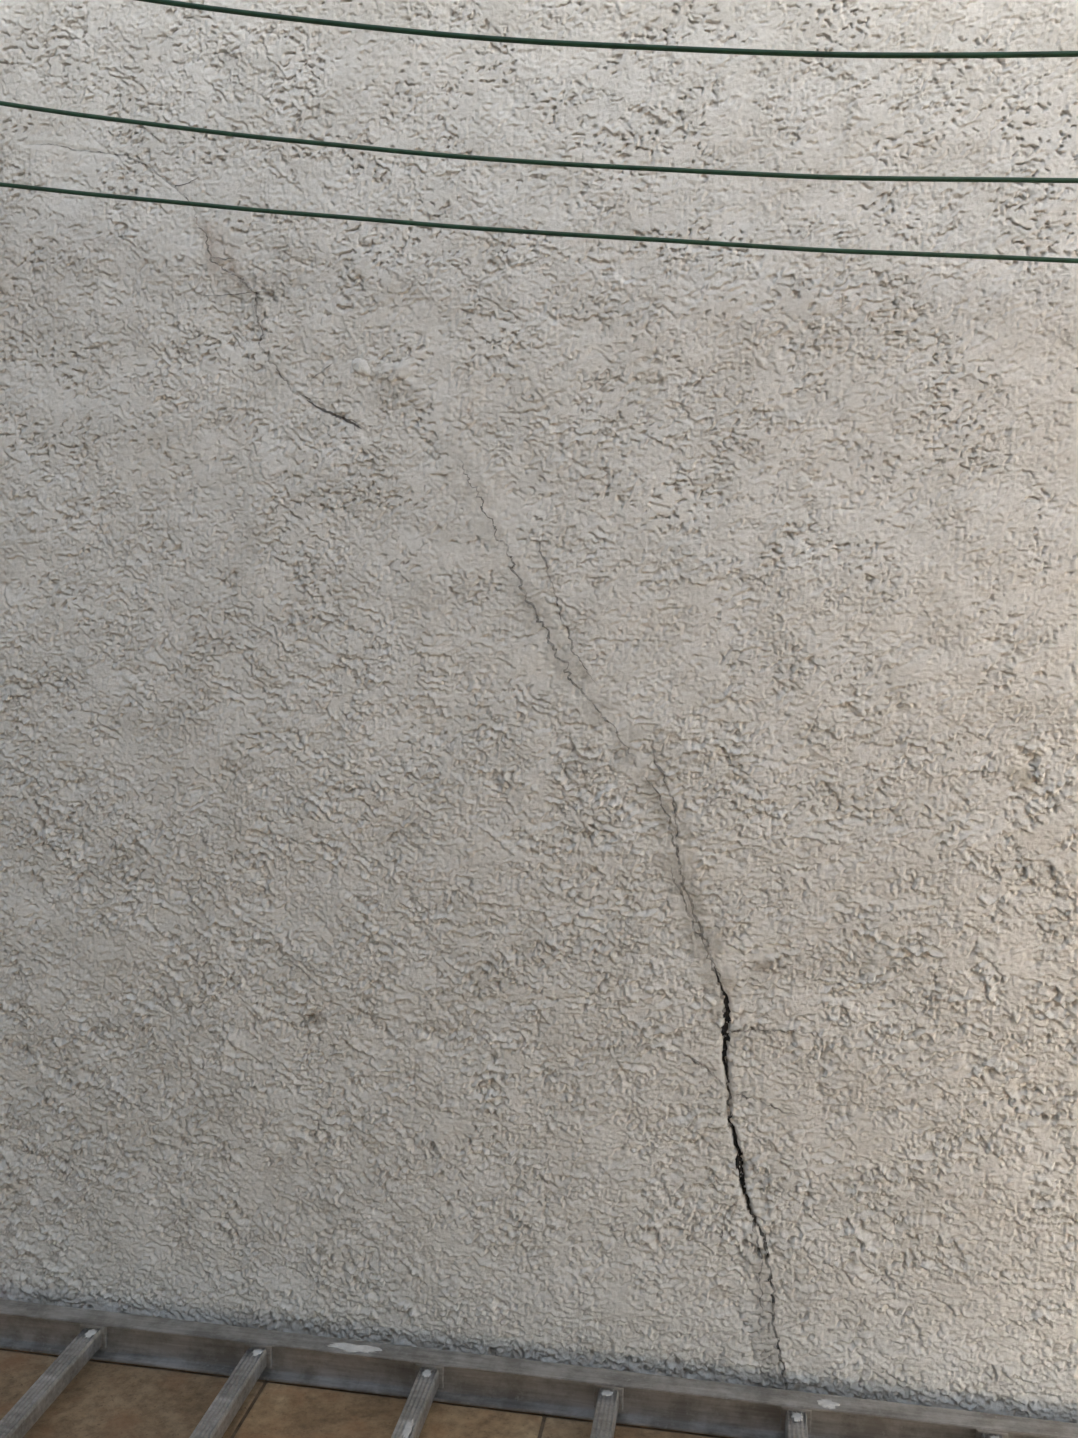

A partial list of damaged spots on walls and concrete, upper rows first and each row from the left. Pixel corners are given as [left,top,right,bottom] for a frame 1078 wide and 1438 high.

crack [463,473,795,1389]